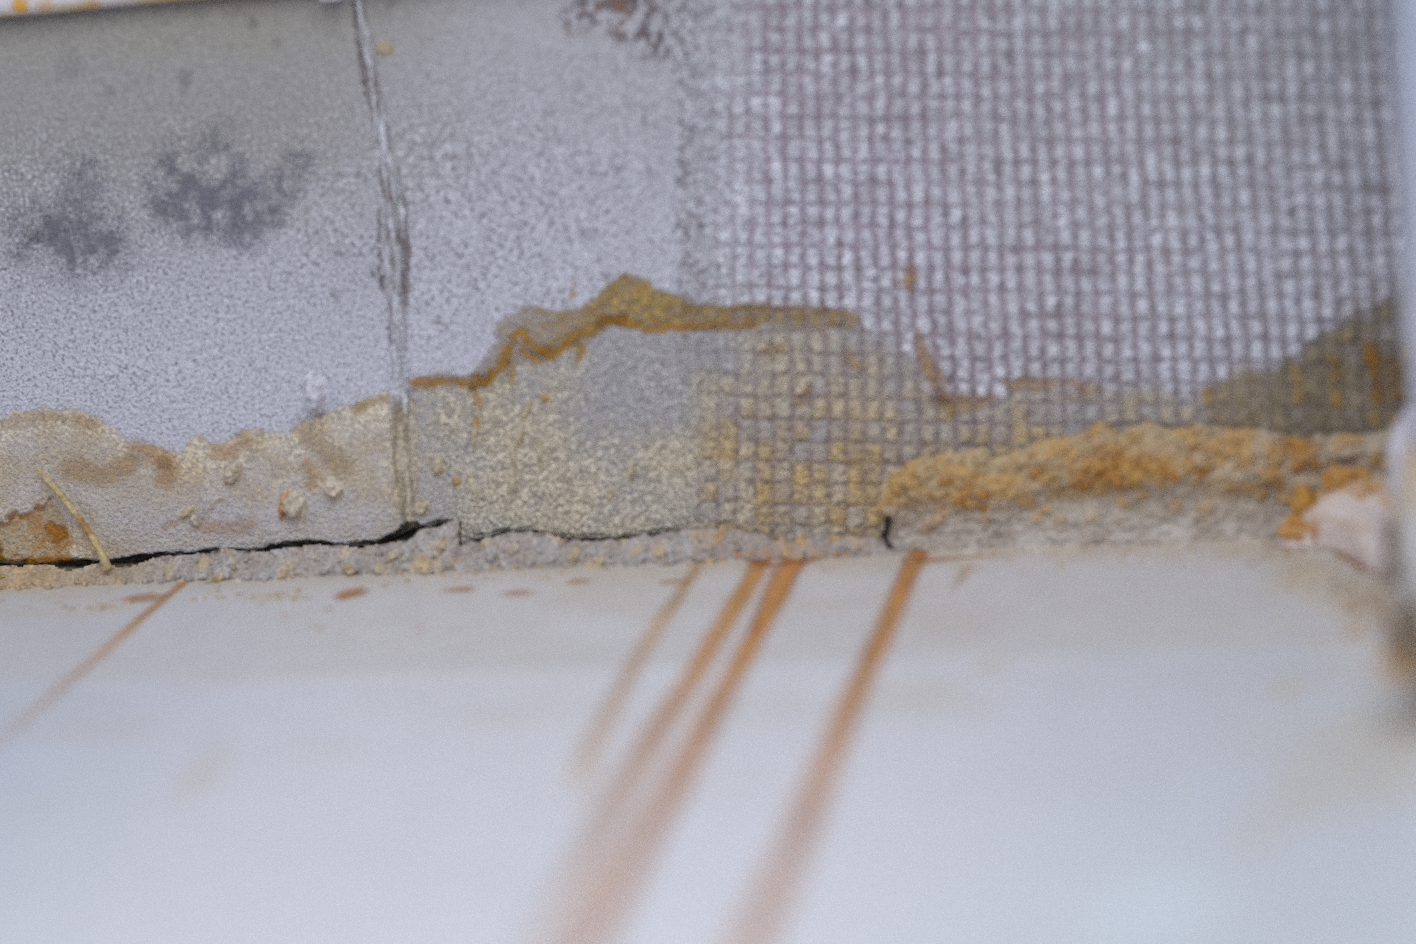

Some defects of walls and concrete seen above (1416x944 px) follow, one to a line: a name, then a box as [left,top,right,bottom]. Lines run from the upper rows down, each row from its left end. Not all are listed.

leakage [35,195,122,266]
leakage [154,158,282,243]
crack [0,0,669,567]
rust [0,497,73,563]
rust [111,582,186,645]
rust [594,557,807,927]
flaking render [0,406,1416,655]
rust [792,550,969,840]